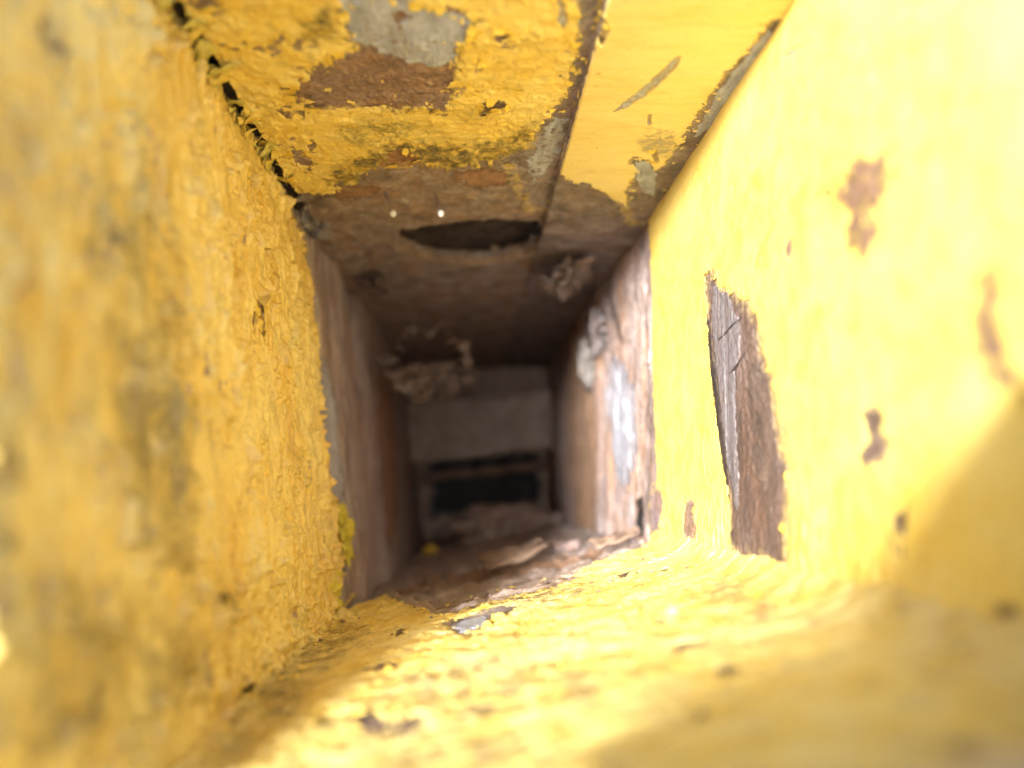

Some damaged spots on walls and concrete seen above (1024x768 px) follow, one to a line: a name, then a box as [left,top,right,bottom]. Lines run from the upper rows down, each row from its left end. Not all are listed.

crack [158,0,310,232]
peeling [228,0,523,128]
peeling [704,265,792,564]
peeling [857,403,893,470]
peeling [681,498,701,541]